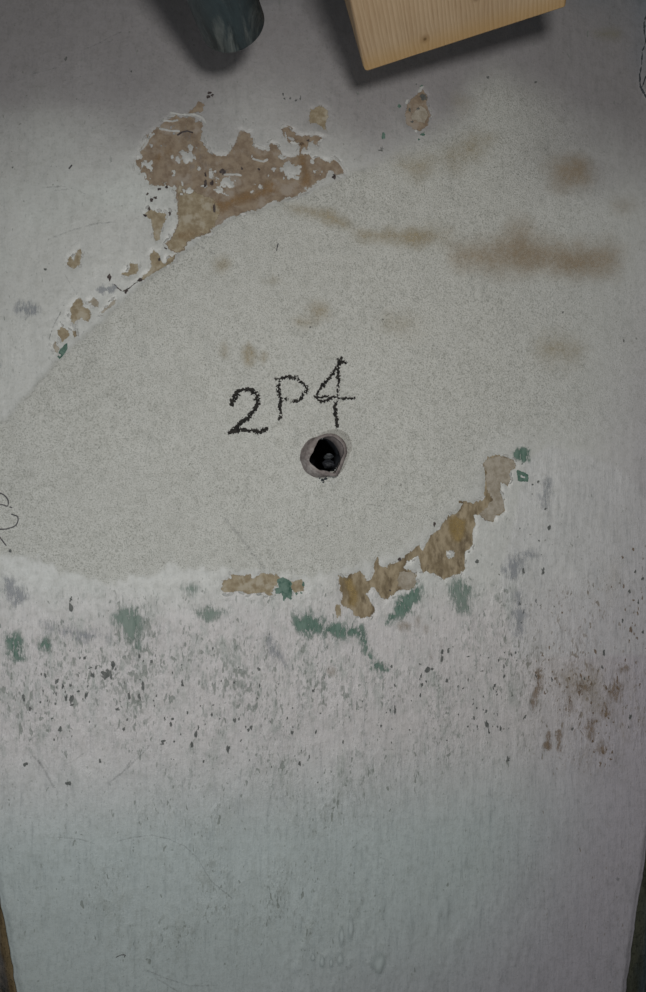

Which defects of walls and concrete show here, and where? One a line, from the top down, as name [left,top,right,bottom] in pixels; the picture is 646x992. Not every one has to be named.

crack [638,16,646,98]
spalling [397,85,433,140]
peeling [49,91,347,359]
peeling [335,454,516,620]
peeling [221,571,305,601]